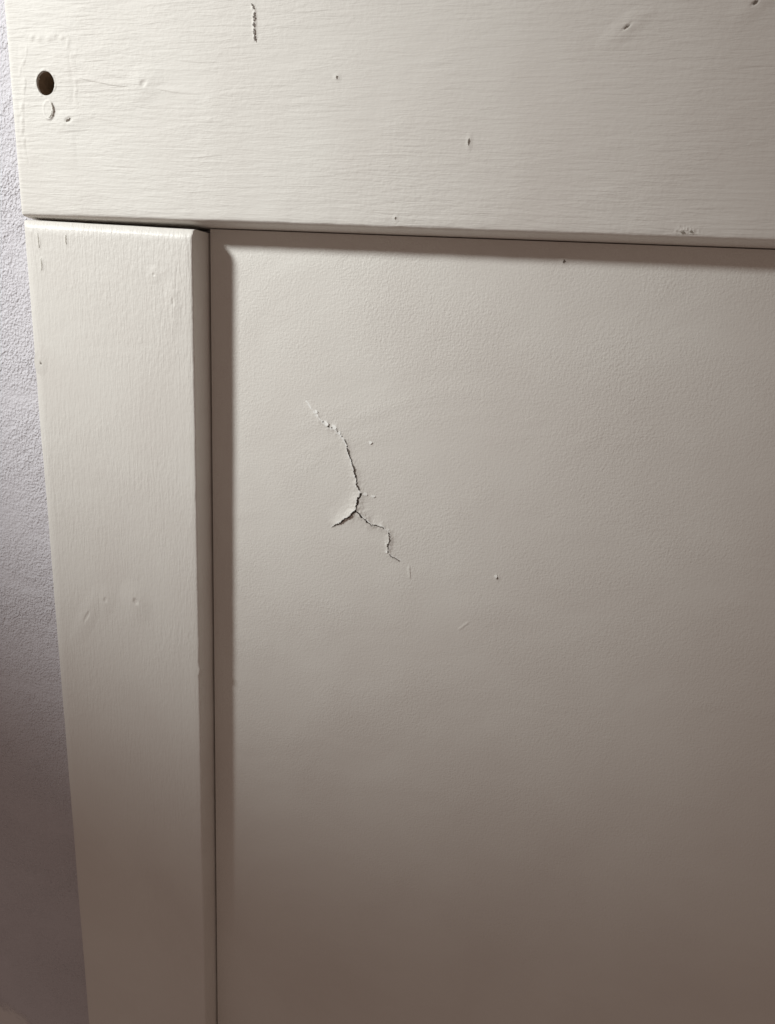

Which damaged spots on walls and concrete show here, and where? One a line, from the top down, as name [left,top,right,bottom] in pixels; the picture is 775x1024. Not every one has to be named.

crack [304,399,411,579]